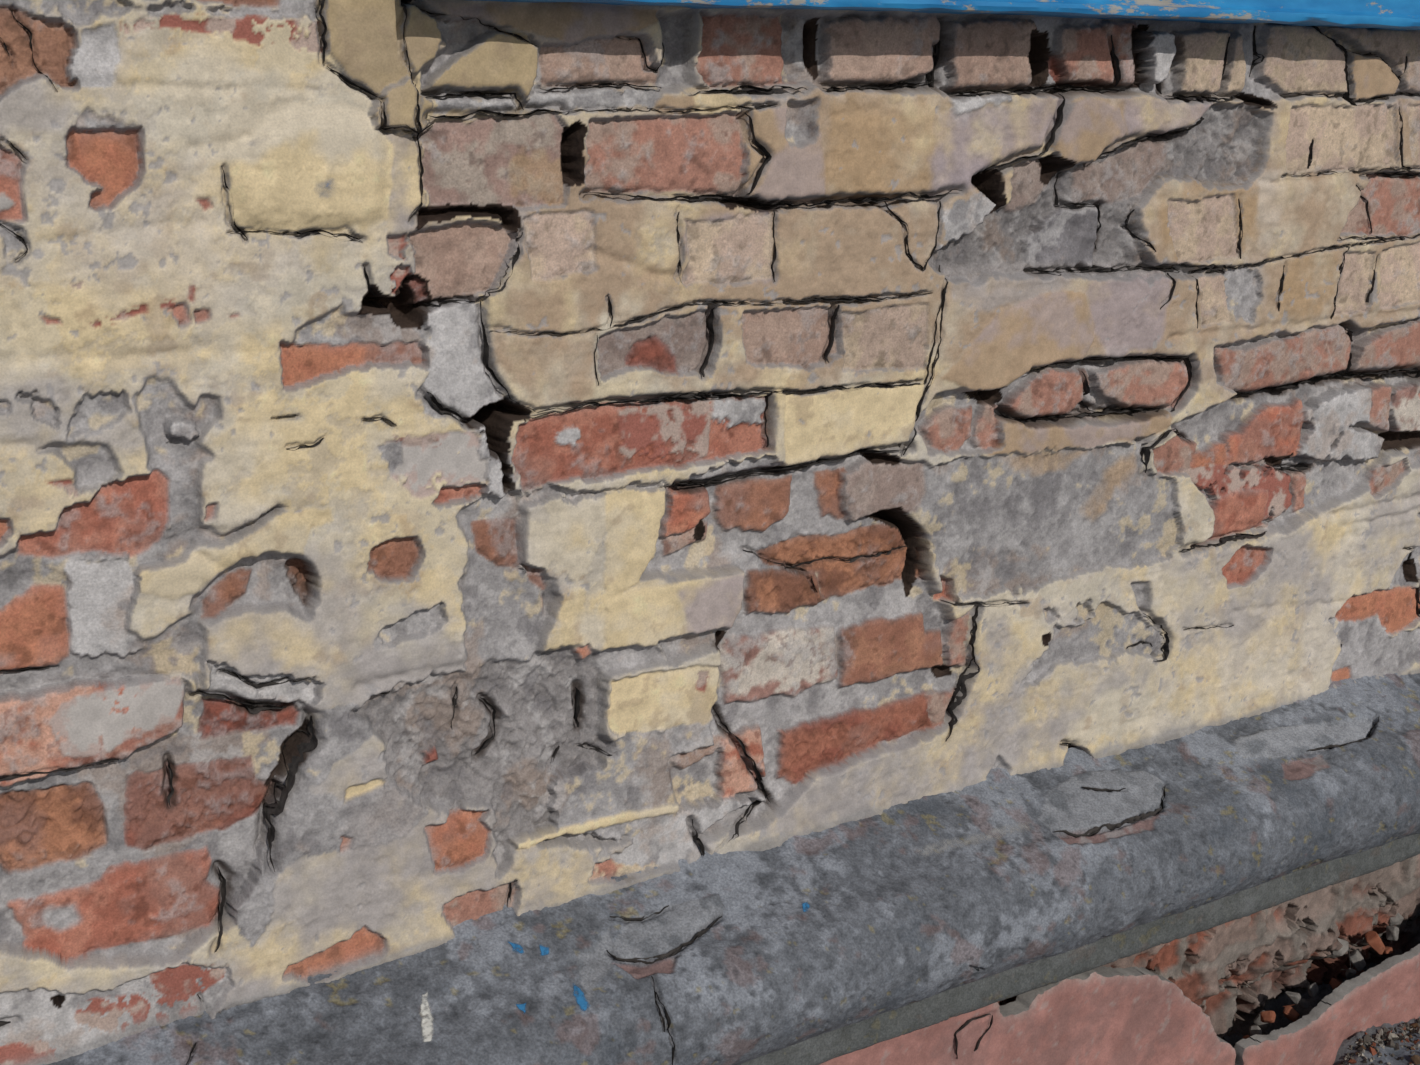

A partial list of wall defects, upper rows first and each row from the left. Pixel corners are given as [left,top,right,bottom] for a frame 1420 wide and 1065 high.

spalling [0,0,133,98]
flaking render [125,0,694,135]
spalling [695,10,1420,325]
spalling [0,109,1420,961]
crack [728,794,769,842]
crack [1054,787,1166,838]
spalling [0,962,234,1065]
flaking render [283,925,387,978]
crack [607,905,722,1065]
crack [954,1014,993,1059]